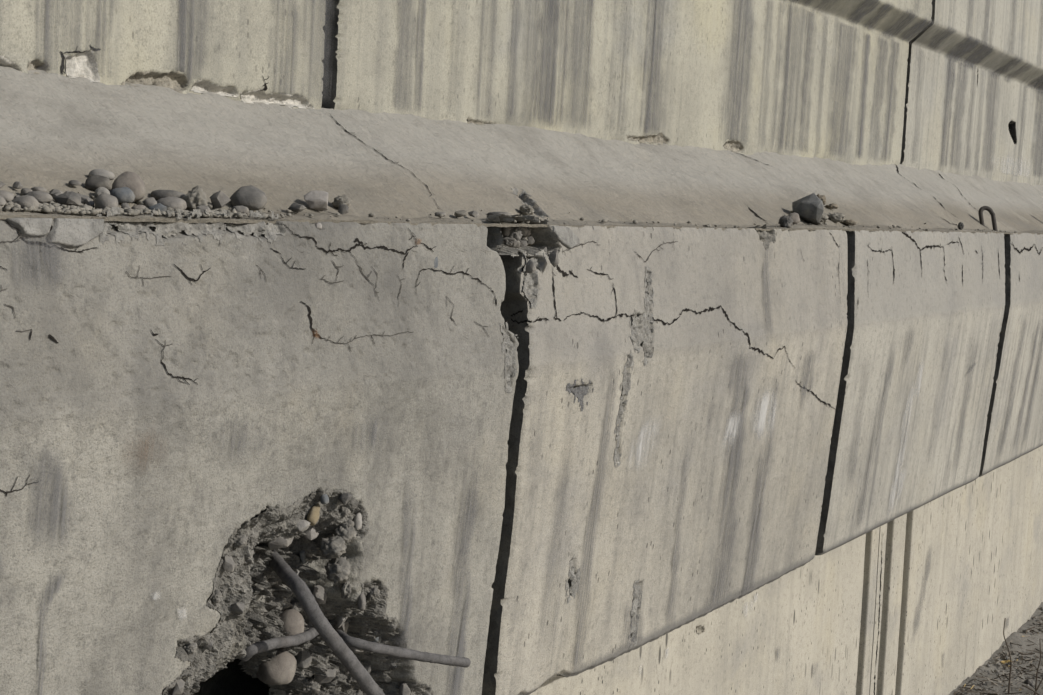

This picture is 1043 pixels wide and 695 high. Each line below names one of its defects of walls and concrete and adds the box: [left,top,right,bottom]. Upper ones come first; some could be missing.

water stain [831,0,992,166]
crack [330,114,443,211]
spalling [1008,121,1017,144]
crack [0,219,97,343]
crack [126,264,210,285]
crack [151,330,198,385]
crack [256,222,835,409]
crack [0,474,39,496]
water stain [724,363,748,559]
water stain [756,397,774,431]
spalling [162,488,433,695]